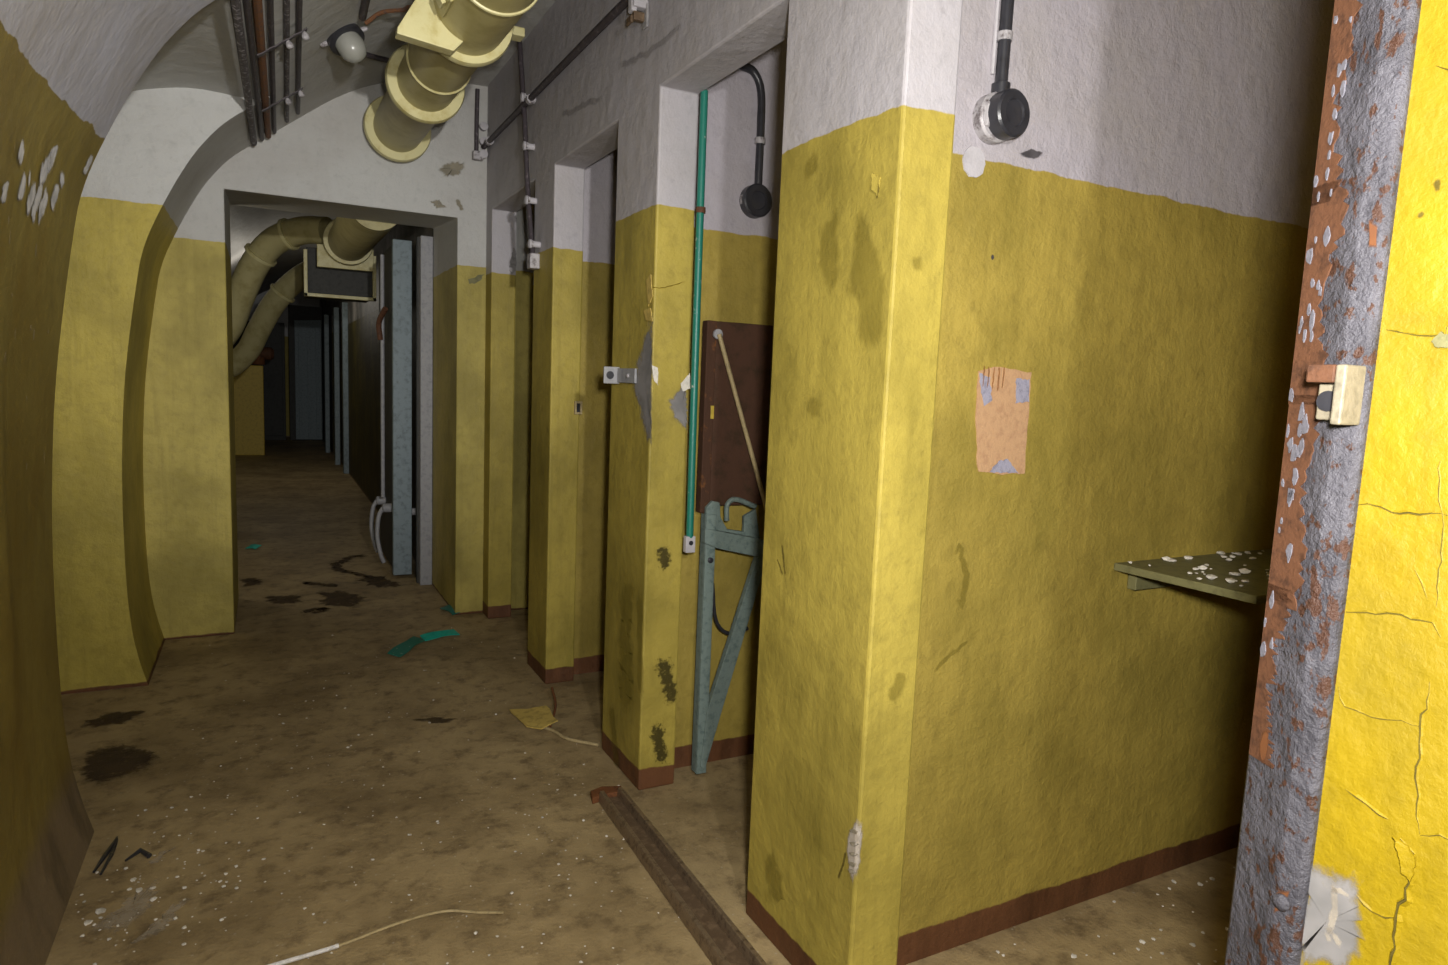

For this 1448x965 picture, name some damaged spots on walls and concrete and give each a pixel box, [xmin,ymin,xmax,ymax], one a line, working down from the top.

corrosion [1369,222,1377,246]
corrosion [1249,0,1363,769]
crack [1386,326,1448,348]
crack [1346,461,1448,638]
crack [1338,682,1448,965]